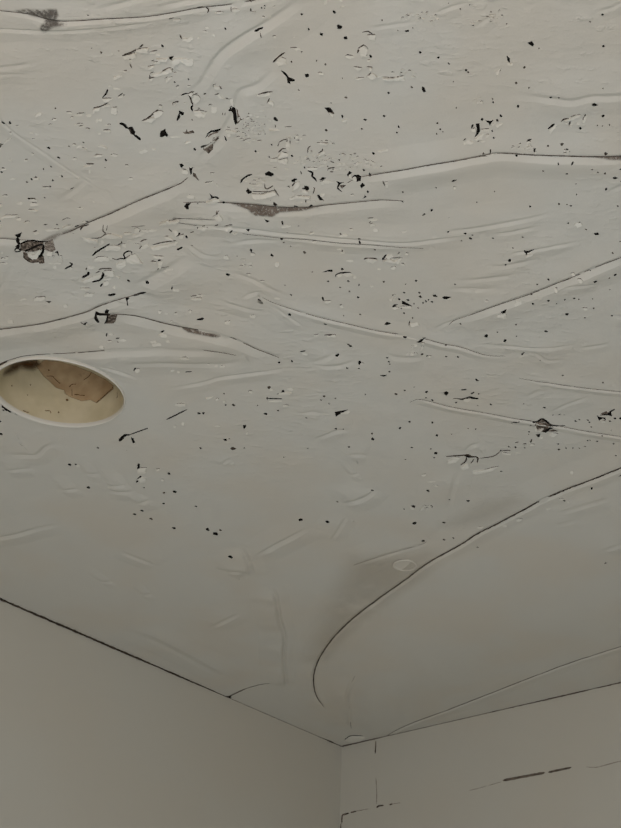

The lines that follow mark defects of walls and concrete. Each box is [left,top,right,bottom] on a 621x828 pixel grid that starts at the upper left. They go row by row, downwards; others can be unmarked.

peeling [273,36,300,84]
peeling [345,31,416,81]
peeling [66,44,388,207]
peeling [463,115,503,158]
peeling [0,164,237,297]
peeling [82,309,126,349]
crack [0,350,105,365]
crack [0,399,621,753]
crack [469,761,621,791]
crack [340,781,398,828]